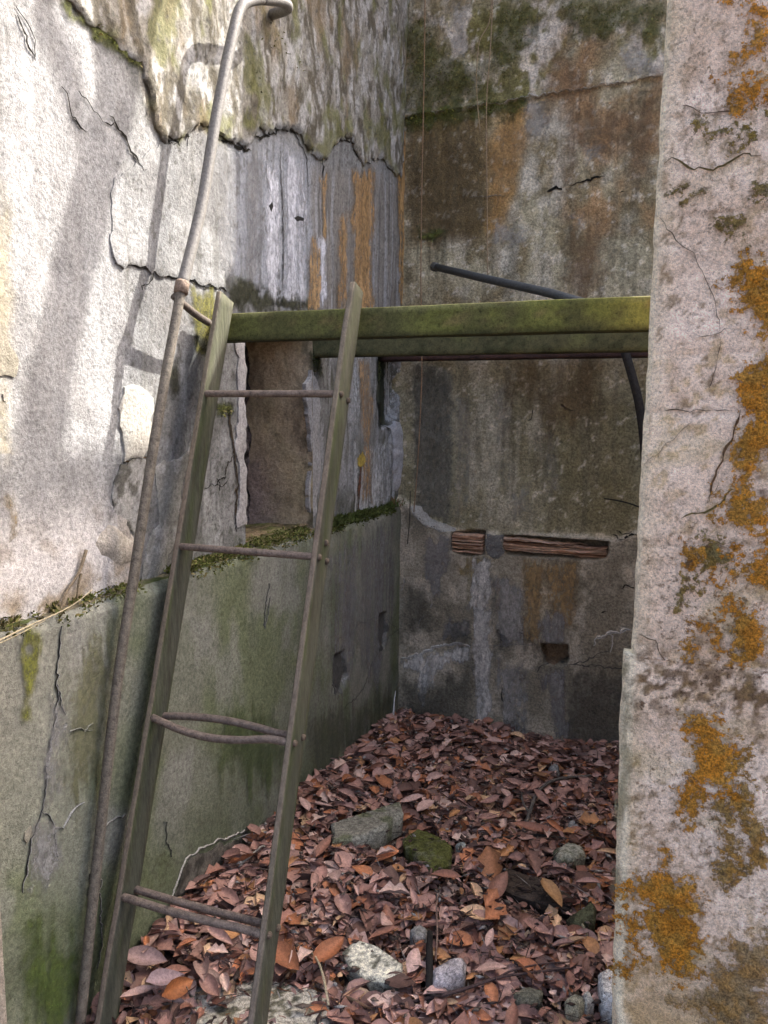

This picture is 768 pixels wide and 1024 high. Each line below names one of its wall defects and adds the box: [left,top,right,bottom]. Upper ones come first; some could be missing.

crack [62,87,143,167]
peeling [66,0,410,292]
corrosion [308,174,327,310]
corrosion [338,169,375,309]
crack [547,176,624,193]
crack [664,153,761,171]
crack [651,217,741,518]
water stain [24,627,40,648]
spalling [332,653,347,694]
crack [22,626,94,893]